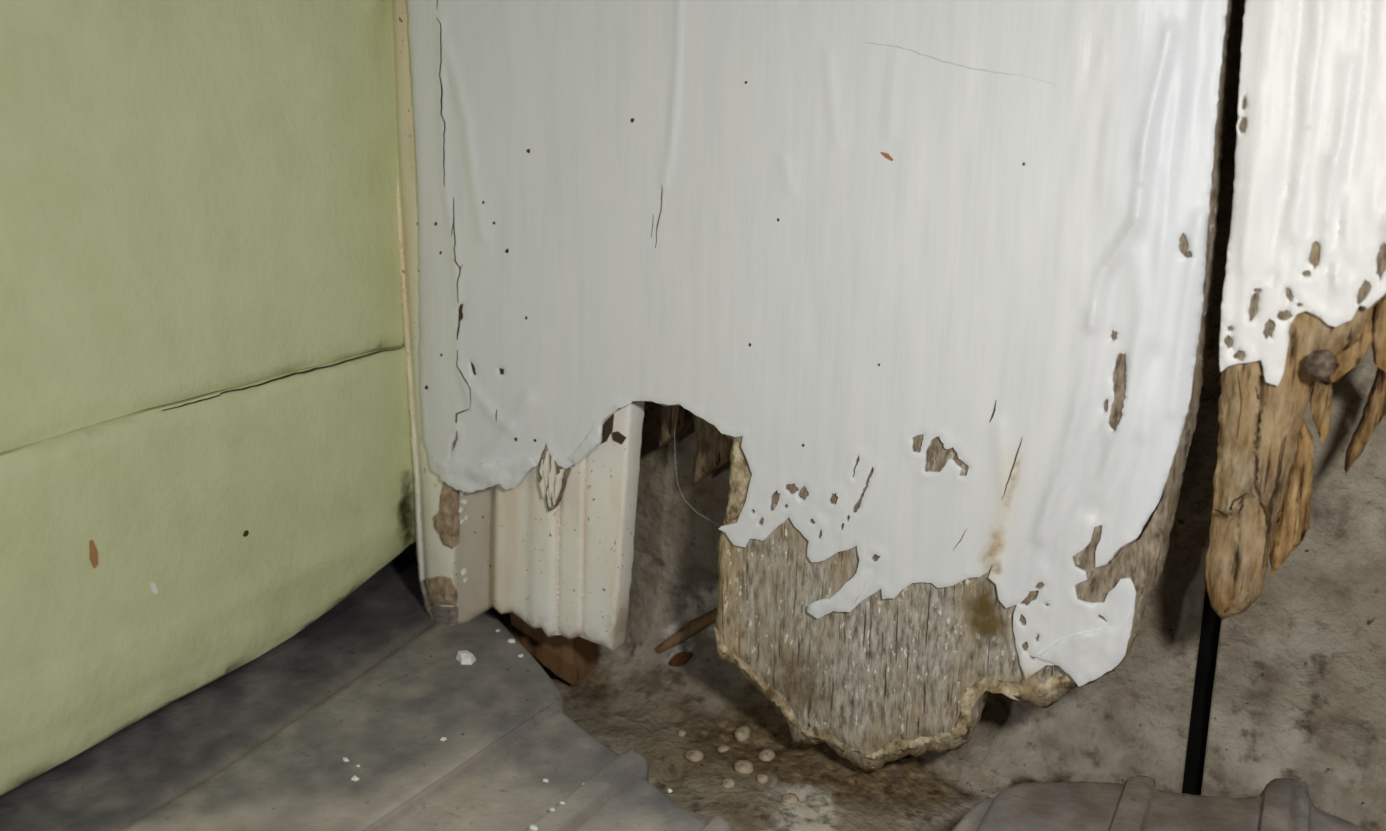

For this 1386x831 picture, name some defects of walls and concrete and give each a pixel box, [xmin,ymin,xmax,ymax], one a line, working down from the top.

crack [437,0,497,434]
peeling [1357,242,1386,306]
peeling [1224,326,1245,361]
peeling [1249,287,1303,339]
crack [162,348,402,411]
peeling [432,436,538,549]
peeling [568,397,632,465]
spalling [724,441,809,525]
peeling [913,434,969,475]
peeling [807,554,880,619]
peeling [1020,482,1171,686]
peeling [456,650,476,665]